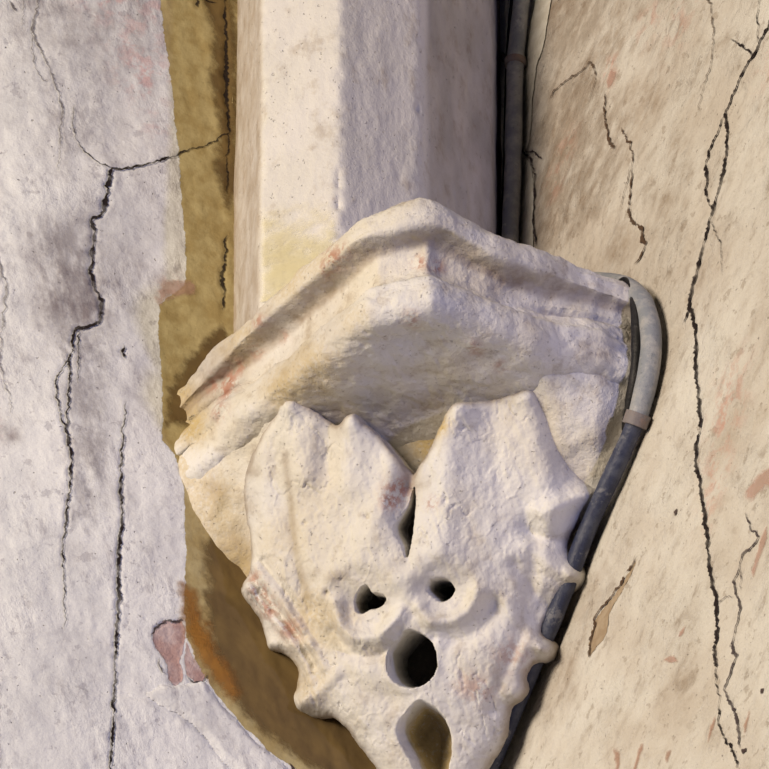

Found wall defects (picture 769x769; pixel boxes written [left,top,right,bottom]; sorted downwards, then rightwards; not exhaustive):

crack [10,0,231,624]
flaking render [158,0,234,463]
flaking render [230,0,238,109]
crack [551,61,646,262]
crack [684,0,769,765]
crack [109,404,127,769]
flaking render [153,481,320,769]
peeling [588,560,637,656]